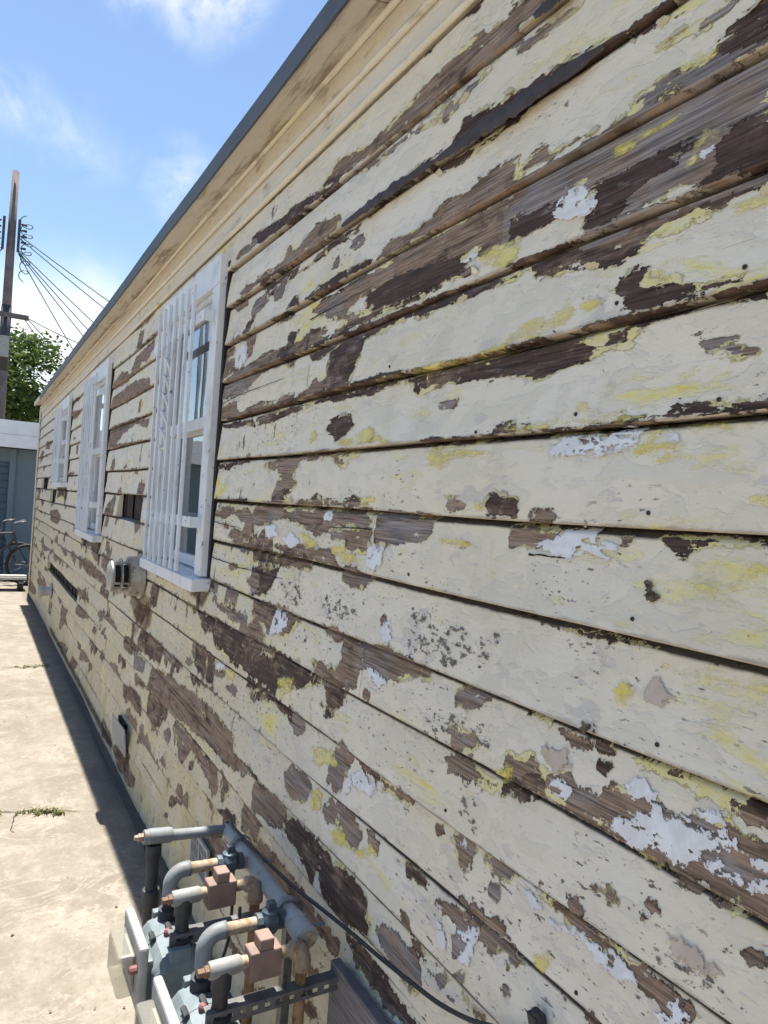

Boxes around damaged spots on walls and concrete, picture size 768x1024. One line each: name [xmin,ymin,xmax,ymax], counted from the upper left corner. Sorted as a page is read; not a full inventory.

peeling [221,0,768,429]
peeling [107,312,156,495]
peeling [416,393,768,456]
peeling [619,535,635,547]
peeling [658,532,768,561]
peeling [515,610,660,649]
peeling [29,411,526,1024]
peeling [425,684,768,923]
peeling [540,892,724,1024]
peeling [720,944,768,970]